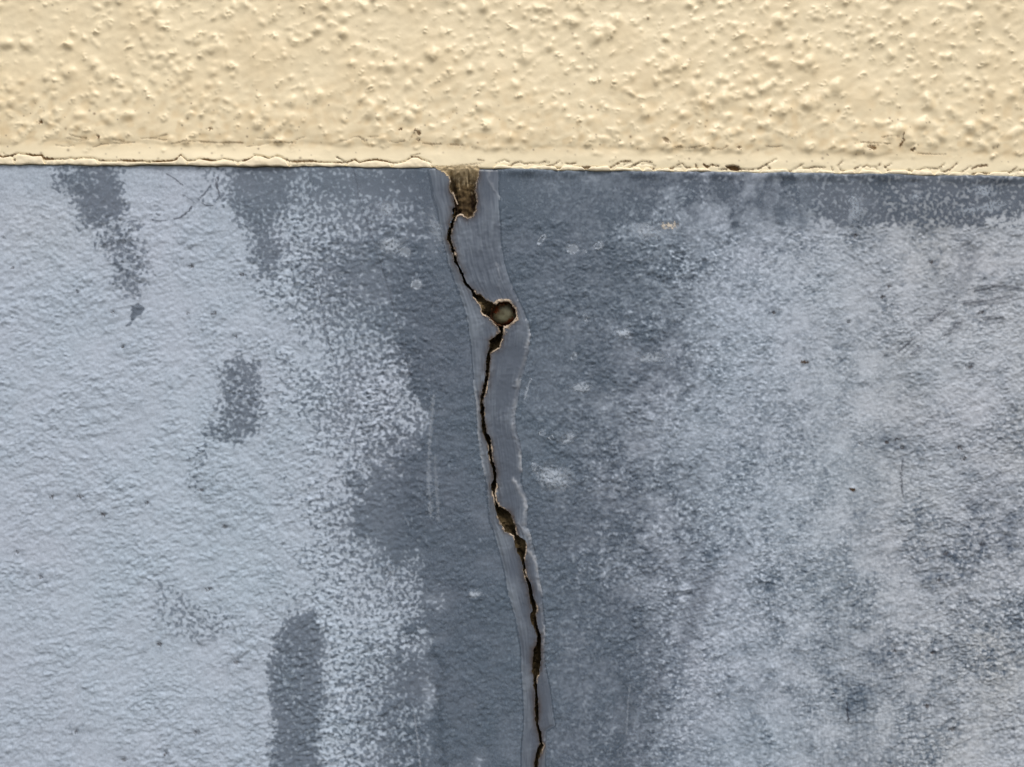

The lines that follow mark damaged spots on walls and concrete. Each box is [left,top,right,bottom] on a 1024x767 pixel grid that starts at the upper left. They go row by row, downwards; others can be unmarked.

damp [58,166,140,286]
spalling [432,165,479,221]
damp [204,361,260,442]
crack [447,195,545,767]
damp [230,166,1024,767]